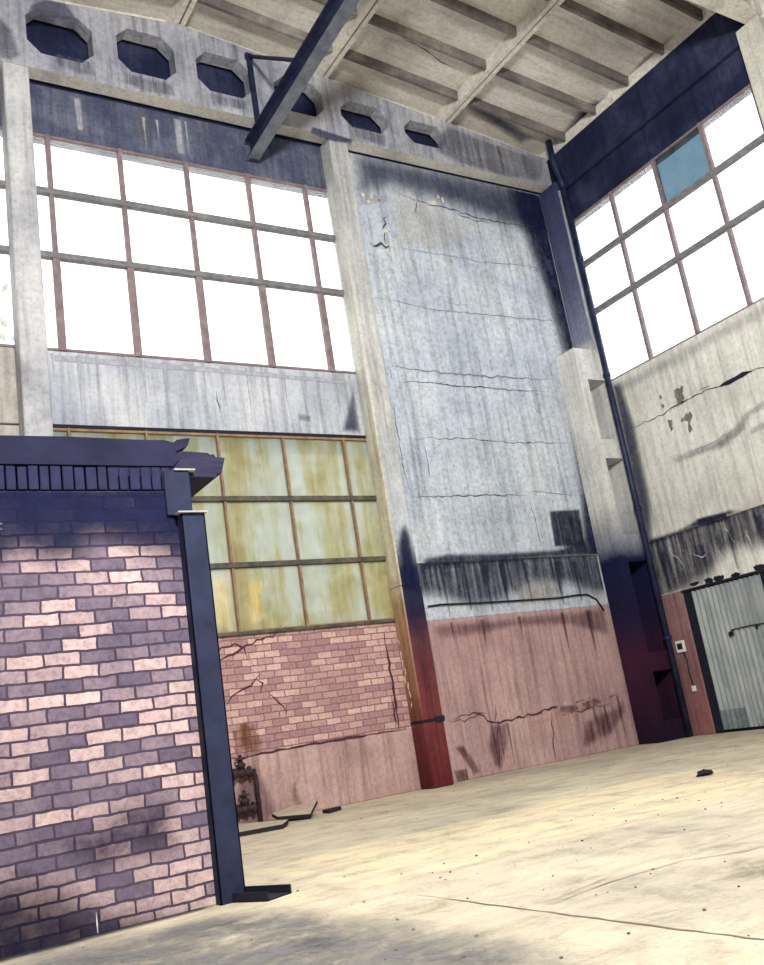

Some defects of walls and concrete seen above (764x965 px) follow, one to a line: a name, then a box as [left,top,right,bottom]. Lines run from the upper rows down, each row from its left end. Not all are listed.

crack [390,366,543,392]
spalling [668,386,693,433]
crack [623,367,764,432]
crack [393,404,570,548]
water stain [482,564,508,604]
crack [219,626,287,717]
crack [231,632,399,759]
crack [450,693,621,758]